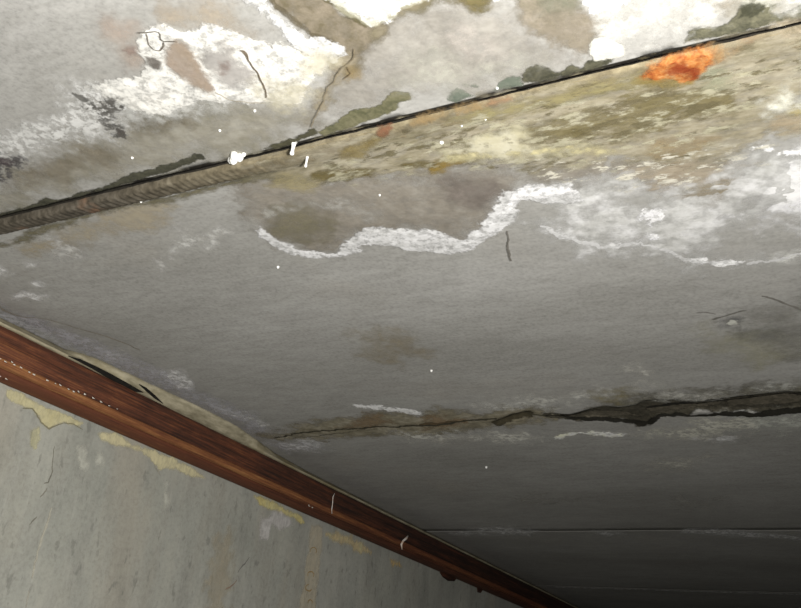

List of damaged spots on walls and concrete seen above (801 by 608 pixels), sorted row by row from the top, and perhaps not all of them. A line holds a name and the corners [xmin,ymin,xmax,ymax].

rust [640,47,724,85]
crack [0,19,801,219]
leakage [0,0,801,270]
crack [505,231,513,261]
crack [762,296,801,310]
leakage [0,314,560,452]
leakage [570,366,730,409]
peeling [6,390,83,448]
peeling [100,433,202,477]
crack [275,391,801,439]
leakage [554,430,625,439]
leakage [646,417,801,441]